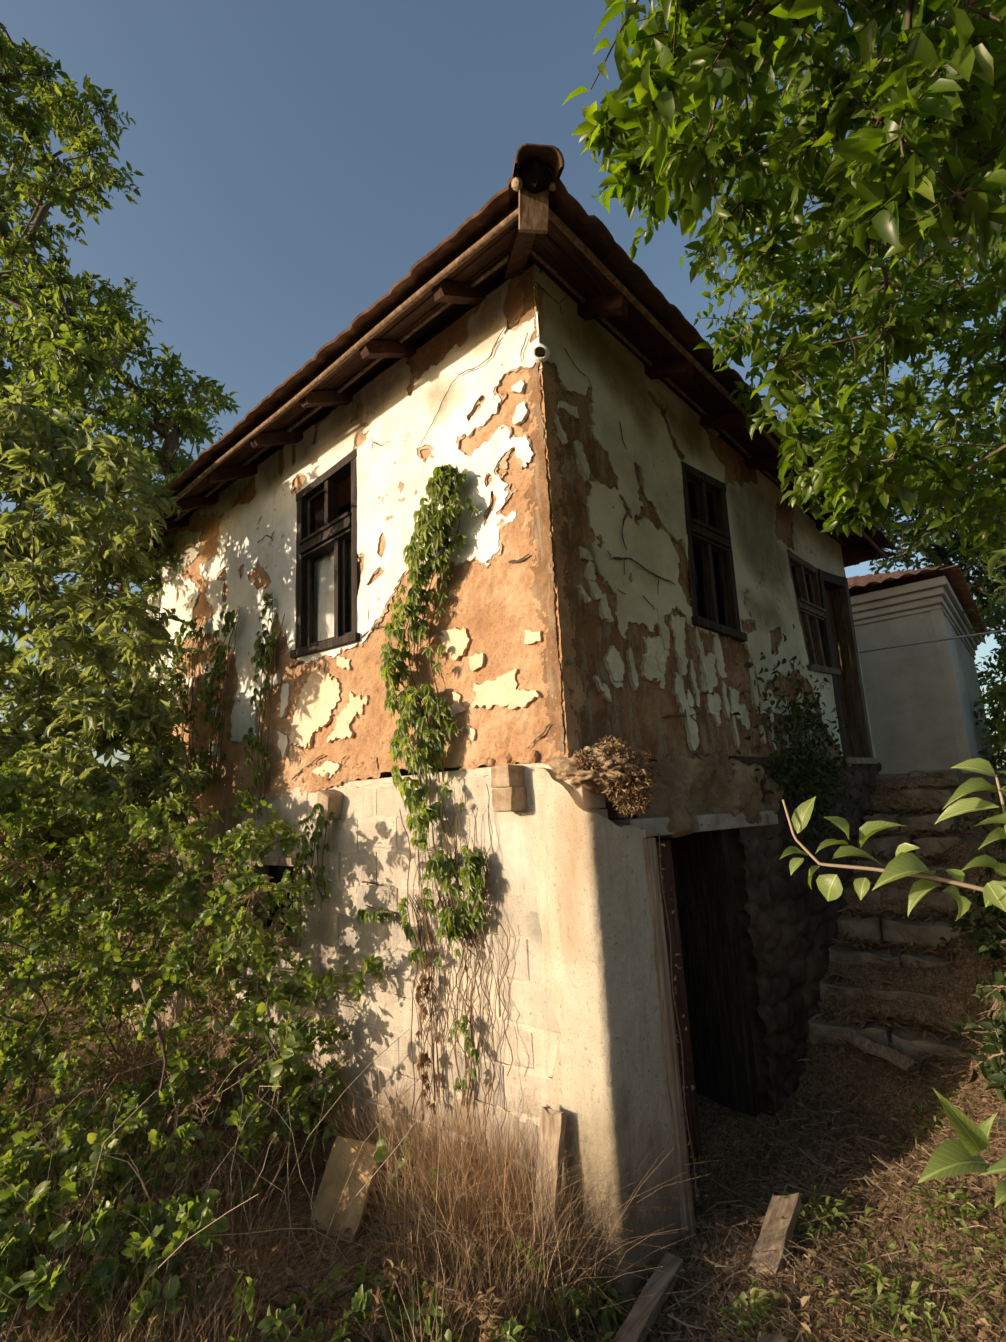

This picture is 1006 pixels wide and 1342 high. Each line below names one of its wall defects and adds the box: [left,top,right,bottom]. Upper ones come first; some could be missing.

spalling [165,362,842,821]
crack [607,512,674,610]